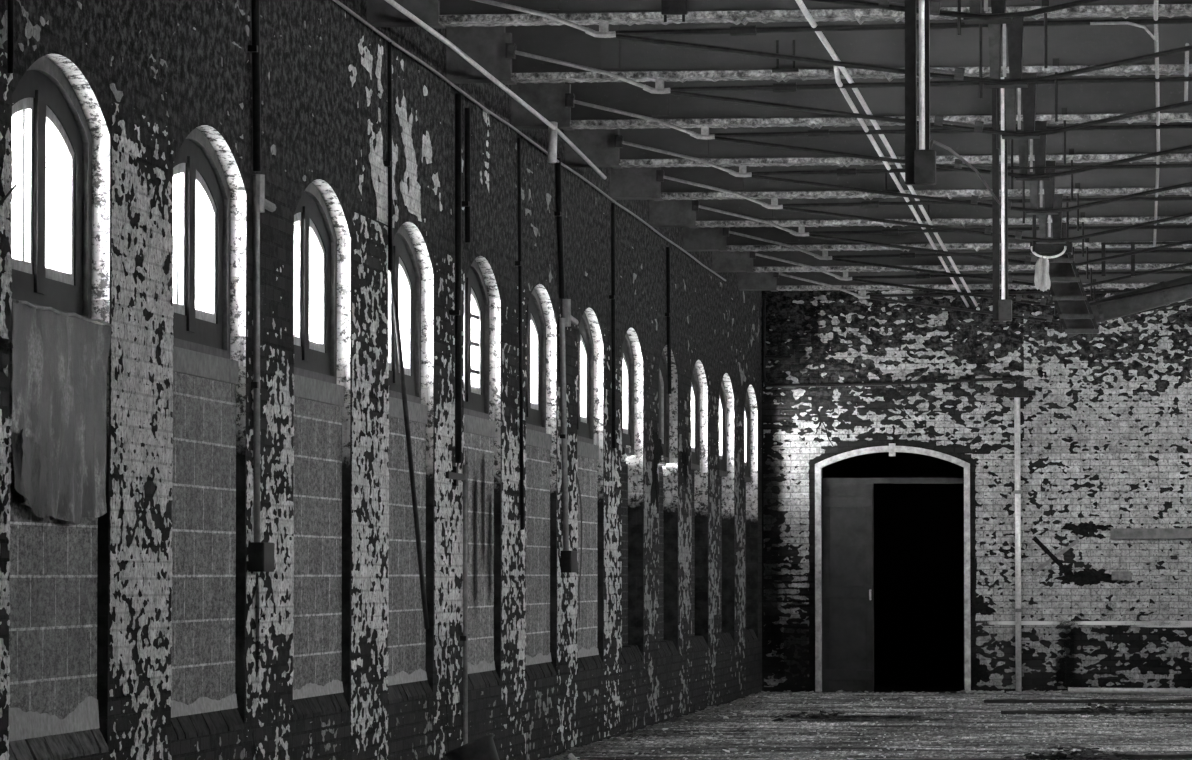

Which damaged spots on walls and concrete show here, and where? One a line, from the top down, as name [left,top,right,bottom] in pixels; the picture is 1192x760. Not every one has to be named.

peeling [0,409,12,760]
peeling [0,126,13,377]
peeling [0,0,49,112]
peeling [102,83,174,760]
peeling [217,0,262,48]
peeling [219,36,471,760]
peeling [480,110,501,191]
peeling [516,164,552,246]
peeling [481,334,745,760]
peeling [714,287,1192,689]